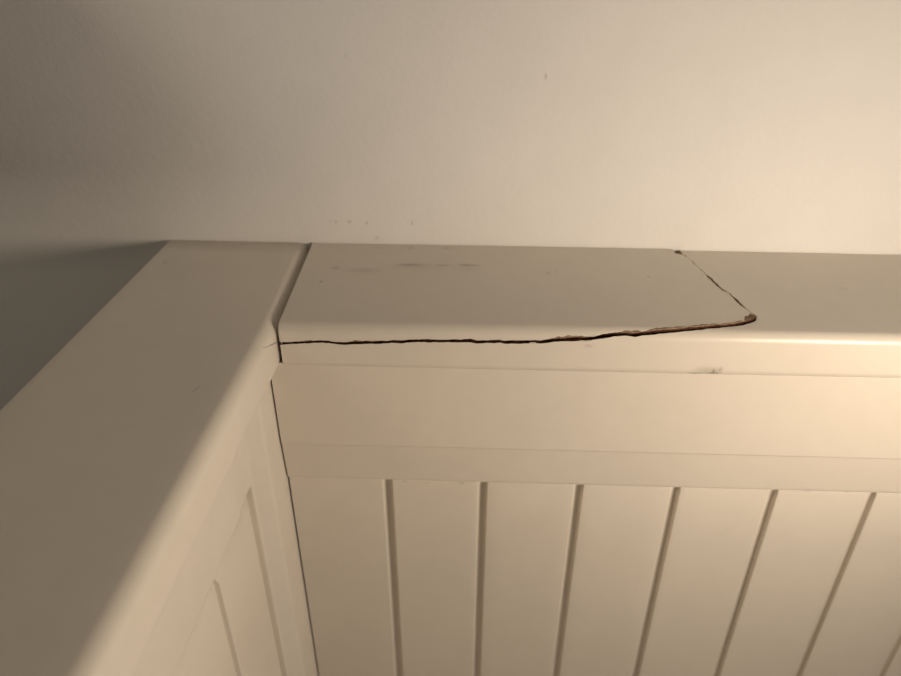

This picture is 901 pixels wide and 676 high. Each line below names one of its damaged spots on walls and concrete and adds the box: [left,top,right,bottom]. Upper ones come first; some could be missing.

crack [263,250,757,348]